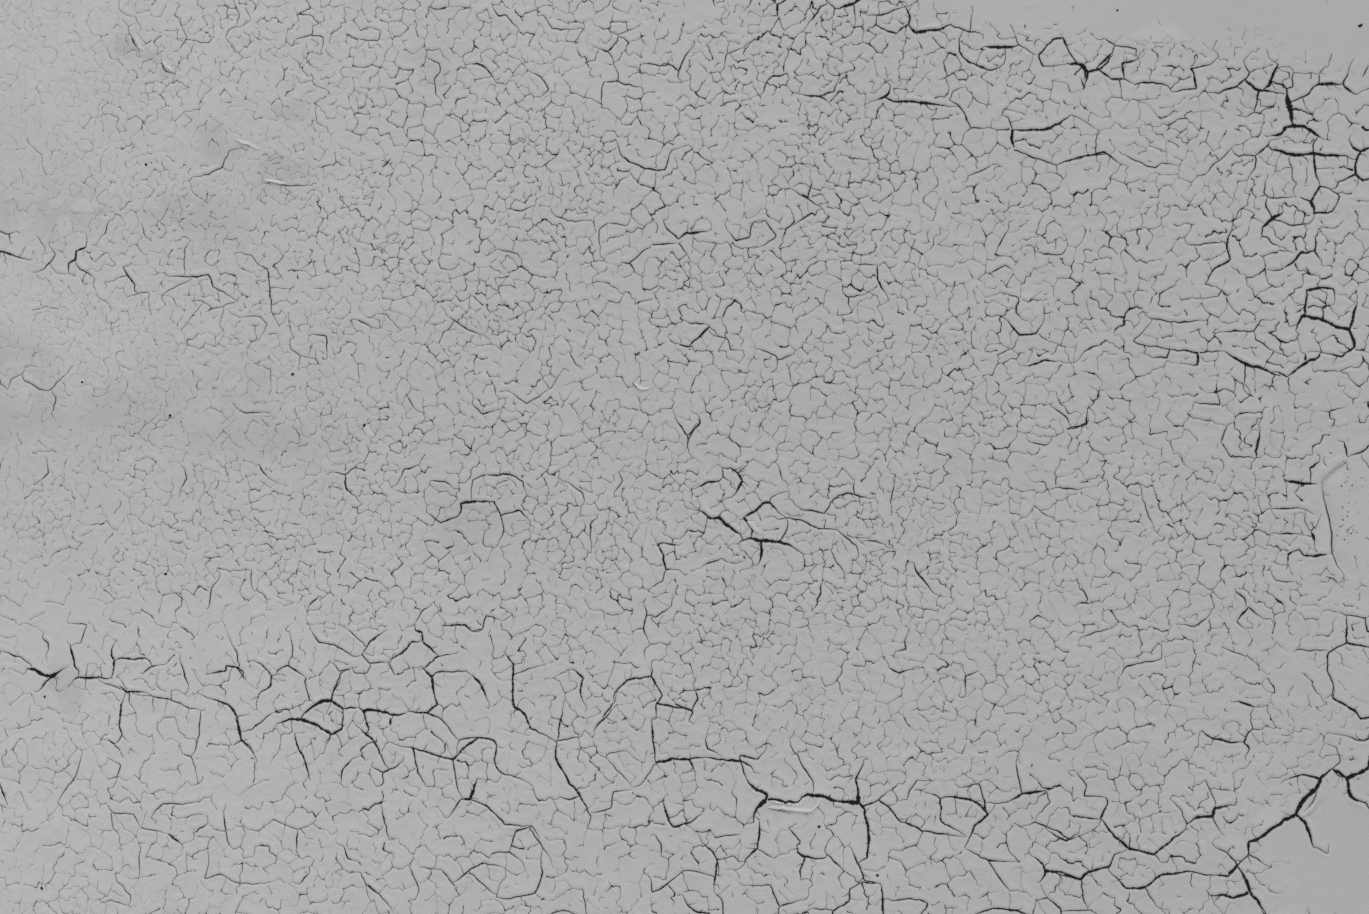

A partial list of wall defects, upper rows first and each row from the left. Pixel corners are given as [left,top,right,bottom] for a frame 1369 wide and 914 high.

crack [601,26,689,102]
crack [763,73,838,101]
crack [610,139,684,171]
crack [0,231,87,272]
crack [552,213,776,262]
crack [830,0,1369,458]
crack [118,265,328,363]
crack [689,322,793,365]
crack [401,464,530,544]
crack [698,466,868,607]
crack [1273,445,1369,509]
crack [1,546,1369,914]